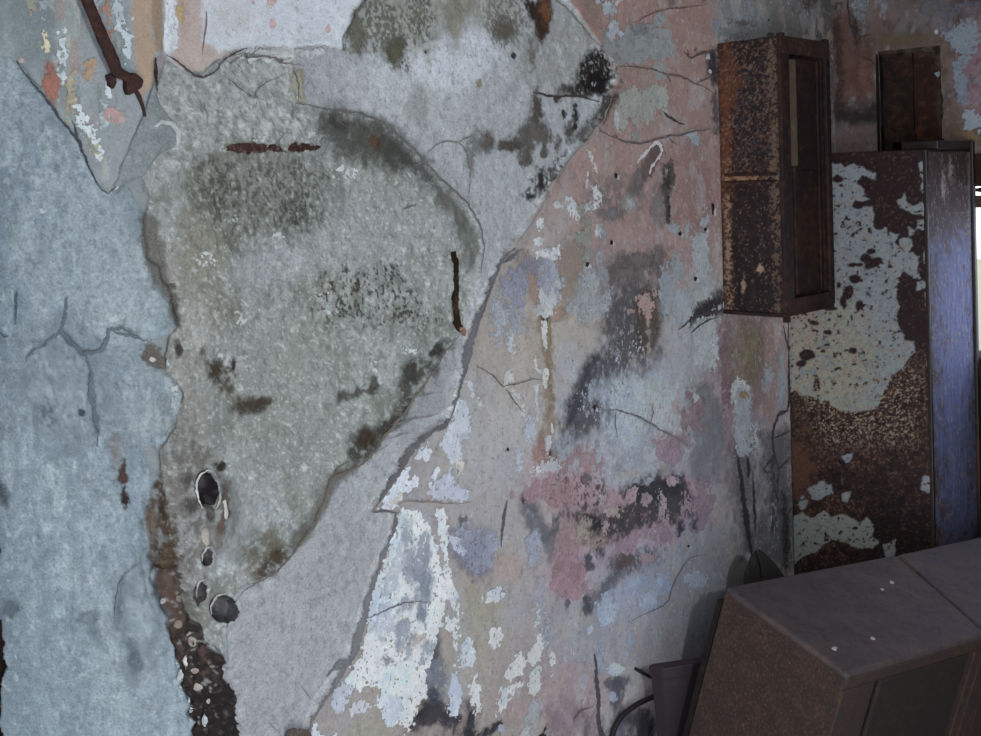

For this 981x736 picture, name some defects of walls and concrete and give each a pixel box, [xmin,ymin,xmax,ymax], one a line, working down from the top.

corrosion [525,0,553,42]
crack [533,90,600,102]
crack [600,111,719,146]
peeling [934,18,981,135]
leakage [319,111,477,267]
leakage [317,261,437,328]
leakage [201,349,272,415]
crack [154,11,540,732]
flaking render [0,0,724,736]
crack [737,326,791,565]
corrosion [145,482,185,568]
leakage [521,473,608,571]